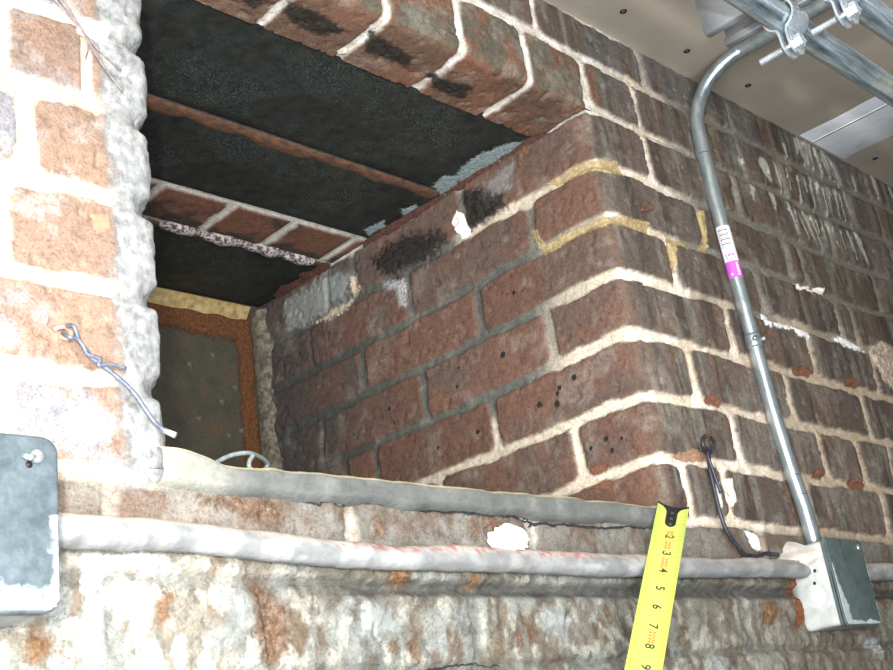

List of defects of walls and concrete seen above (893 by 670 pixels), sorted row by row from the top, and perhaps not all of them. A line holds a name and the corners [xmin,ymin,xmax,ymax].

damp [758,136,868,265]
damp [760,314,809,341]
damp [834,336,864,353]
crack [427,662,500,670]